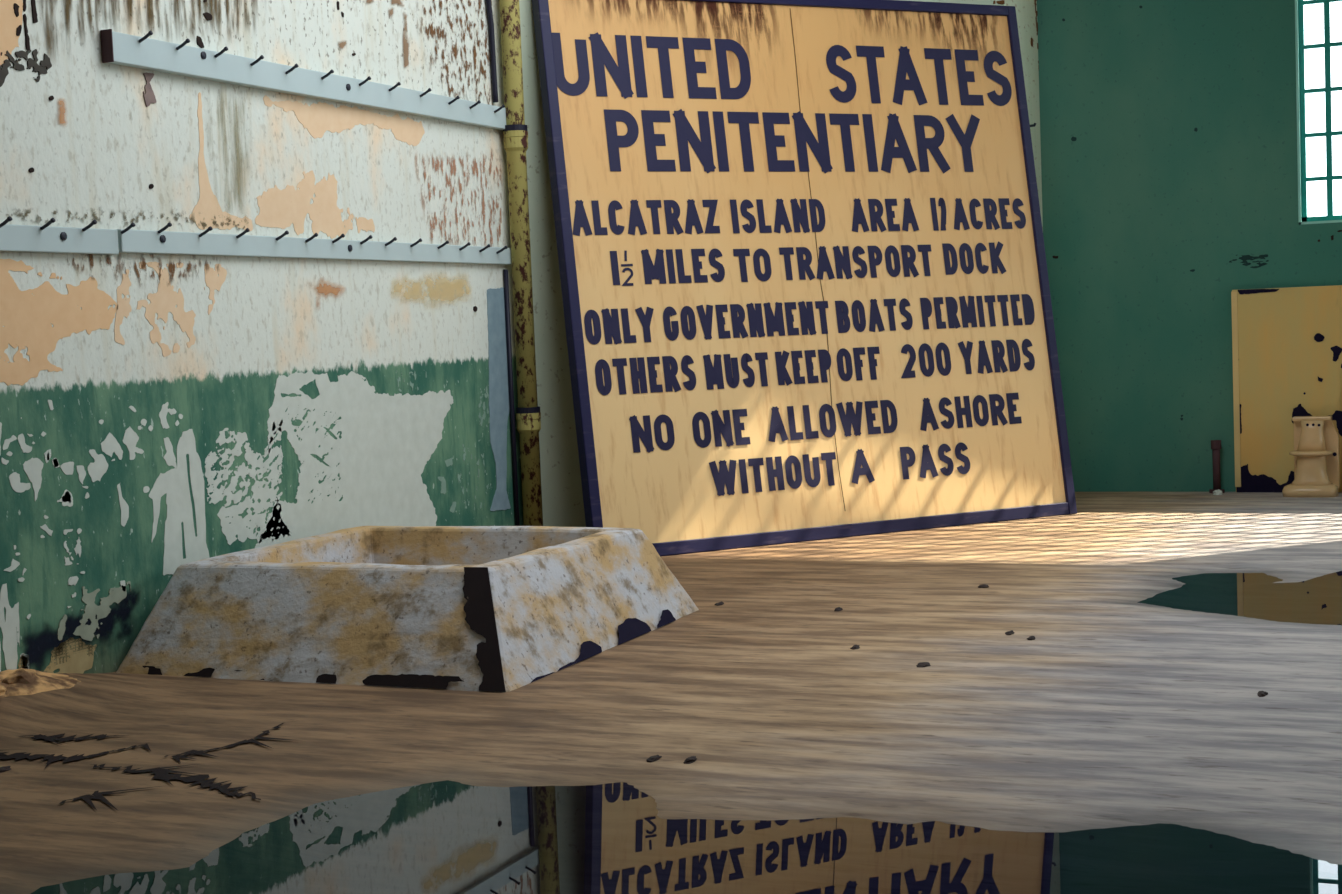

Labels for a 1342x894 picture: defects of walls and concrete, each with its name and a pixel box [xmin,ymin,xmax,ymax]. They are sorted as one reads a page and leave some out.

peeling [0,0,23,66]
damp [0,0,255,87]
peeling [189,92,375,239]
peeling [263,95,425,146]
peeling [0,259,227,386]
peeling [0,287,511,575]
peeling [0,515,131,674]